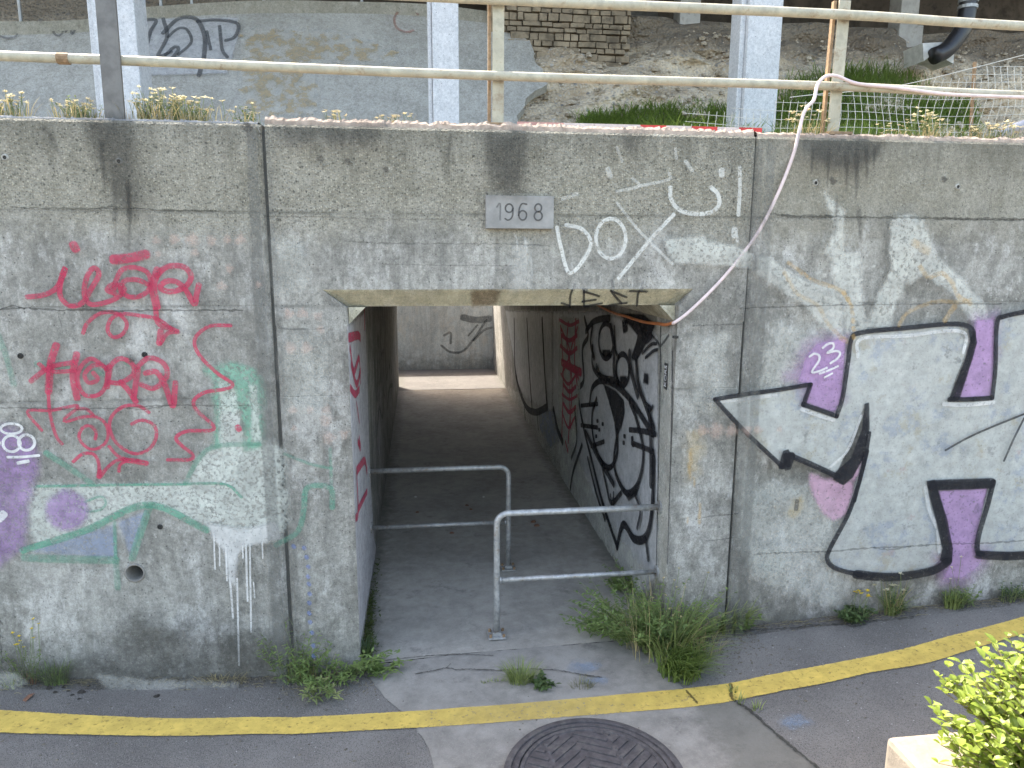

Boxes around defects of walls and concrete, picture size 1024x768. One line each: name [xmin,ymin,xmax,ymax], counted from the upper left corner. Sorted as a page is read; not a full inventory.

leakage [91,120,132,222]
leakage [805,139,881,186]
crack [384,654,600,678]